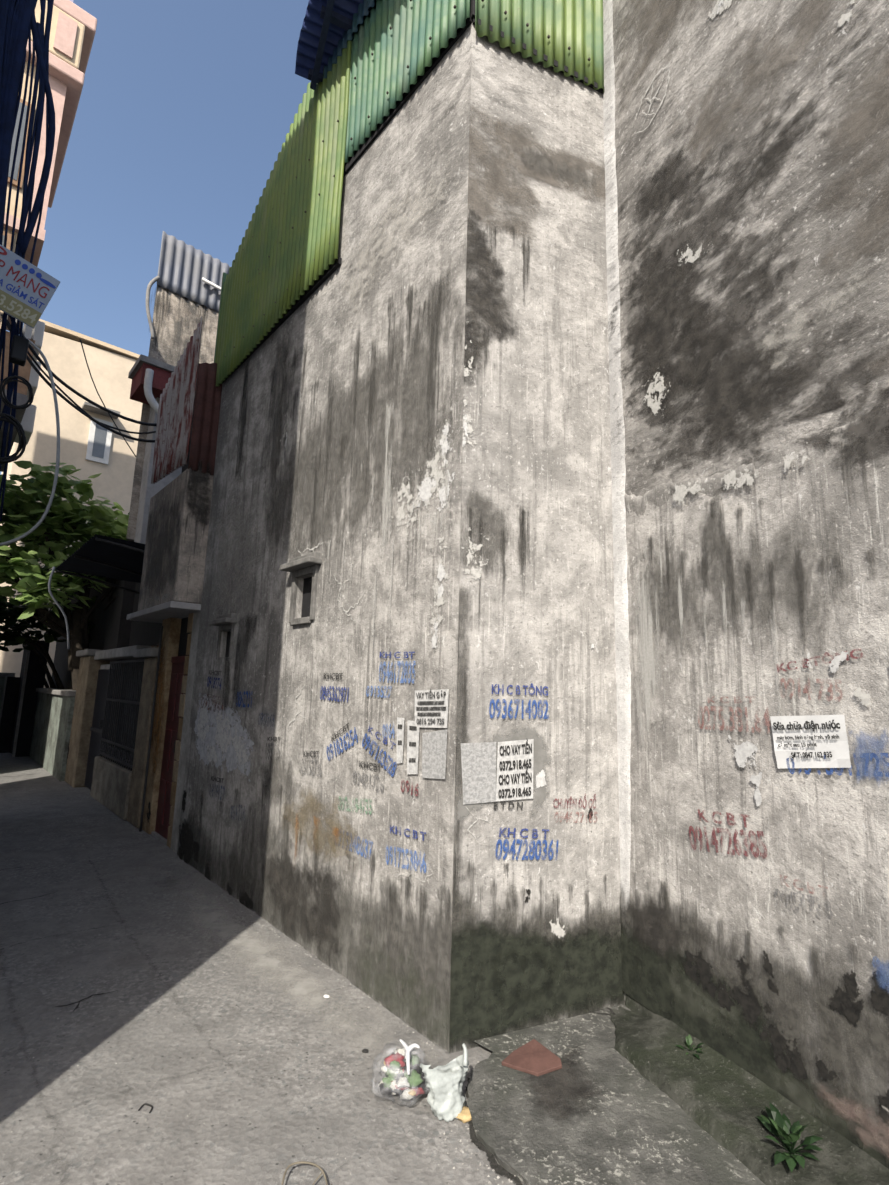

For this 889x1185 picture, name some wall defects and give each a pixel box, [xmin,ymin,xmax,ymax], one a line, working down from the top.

water stain [236,361,249,474]
water stain [263,108,606,613]
water stain [610,0,889,481]
crack [55,990,118,1010]
crack [465,1078,522,1185]
water stain [184,486,889,1129]